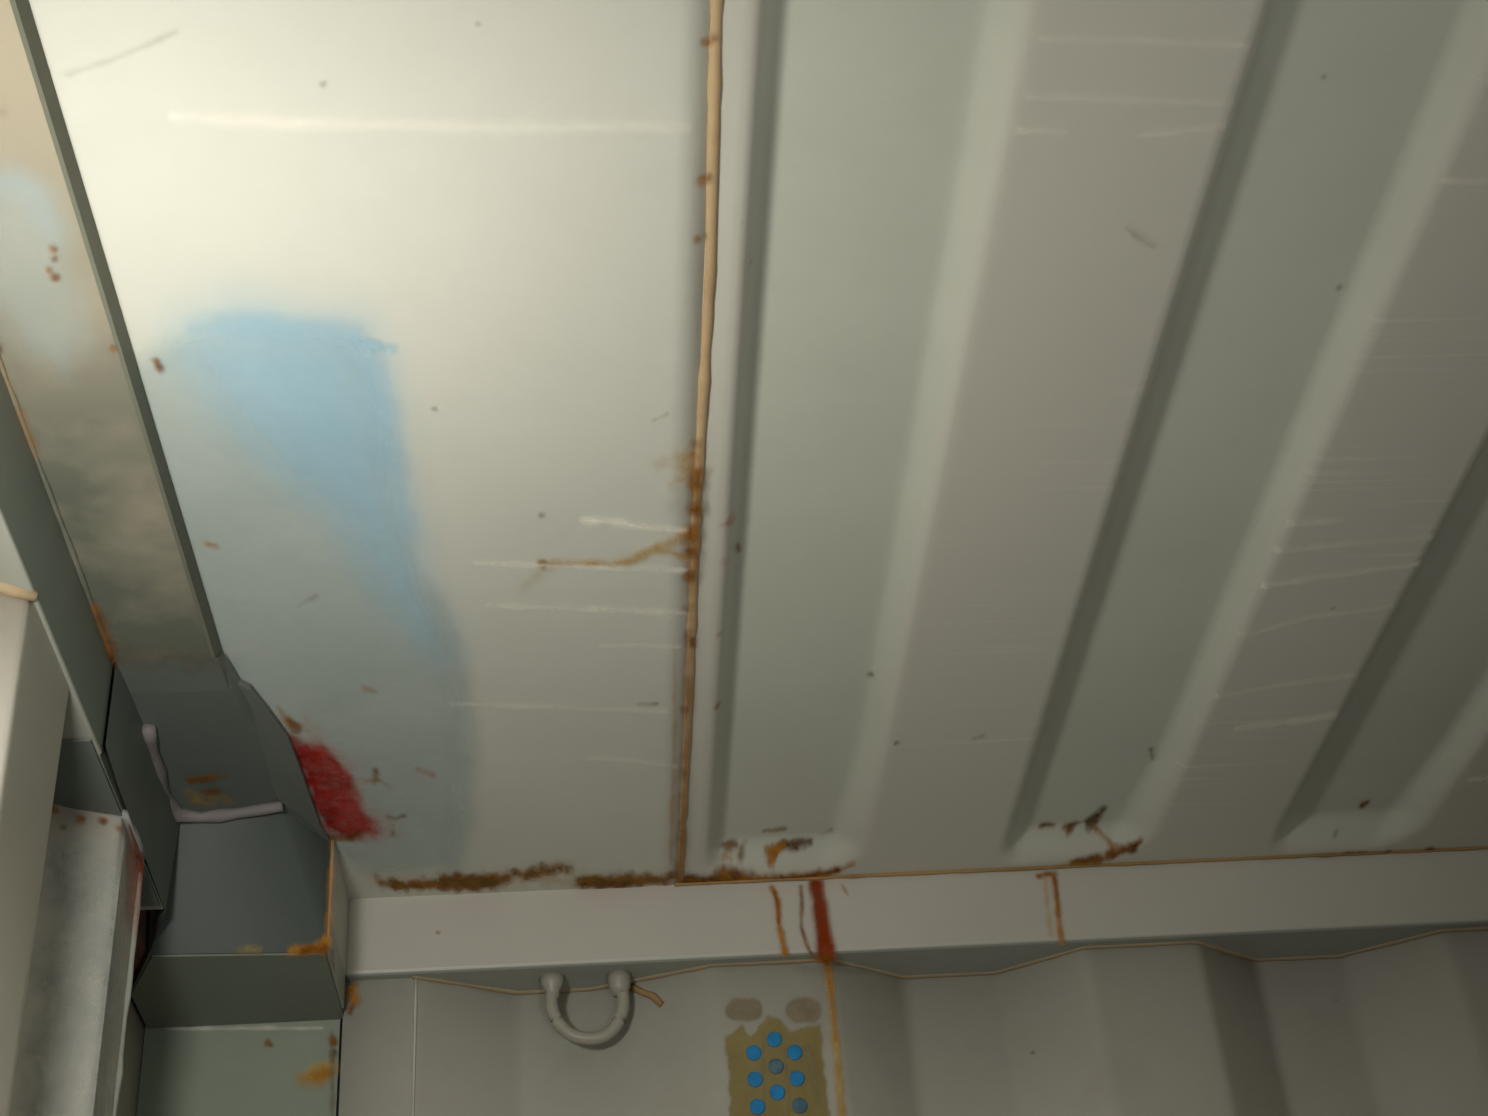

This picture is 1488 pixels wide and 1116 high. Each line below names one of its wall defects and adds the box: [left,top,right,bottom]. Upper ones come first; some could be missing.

rust [684,470,699,581]
rust [1040,808,1105,833]
rust [1070,840,1141,866]
rust [1037,872,1064,944]
rust [289,937,335,971]
rust [379,822,844,1116]